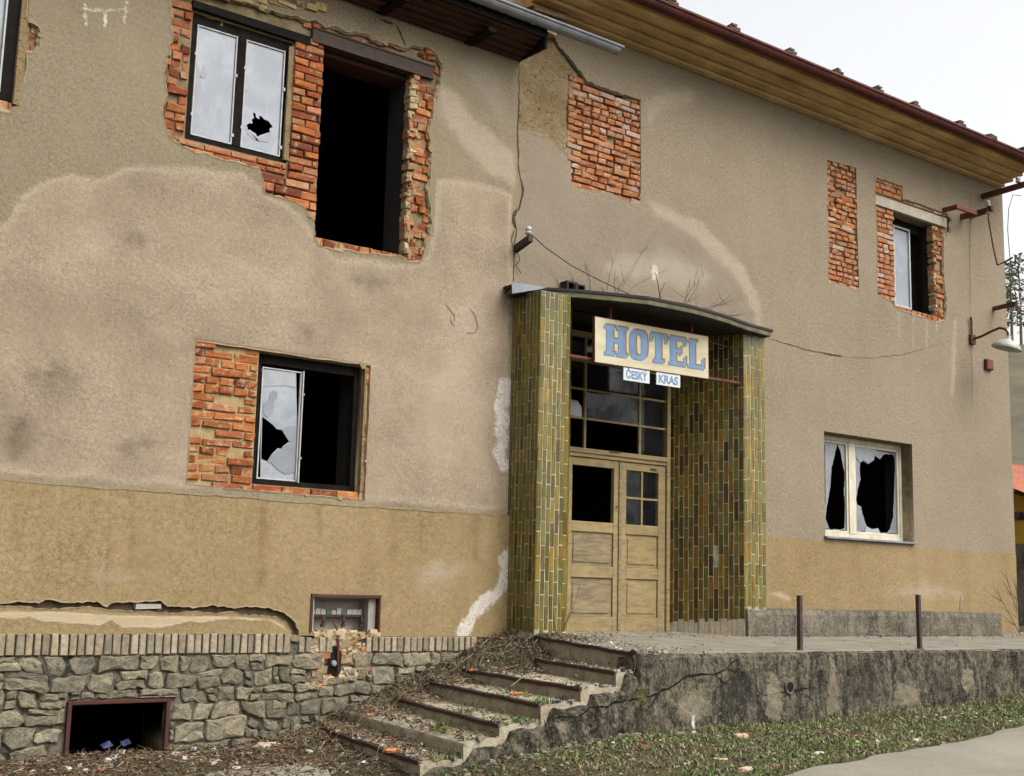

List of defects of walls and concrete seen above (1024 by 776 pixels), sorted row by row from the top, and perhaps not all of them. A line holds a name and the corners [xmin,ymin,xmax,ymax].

flaking render [186,340,371,501]
flaking render [161,0,444,263]
damp [0,88,762,510]
crack [511,75,524,277]
flaking render [518,6,641,155]
crack [776,340,942,358]
flaking render [874,175,952,323]
flaking render [0,612,284,628]
spalling [305,629,381,688]
damp [456,549,508,636]
crack [543,659,745,739]